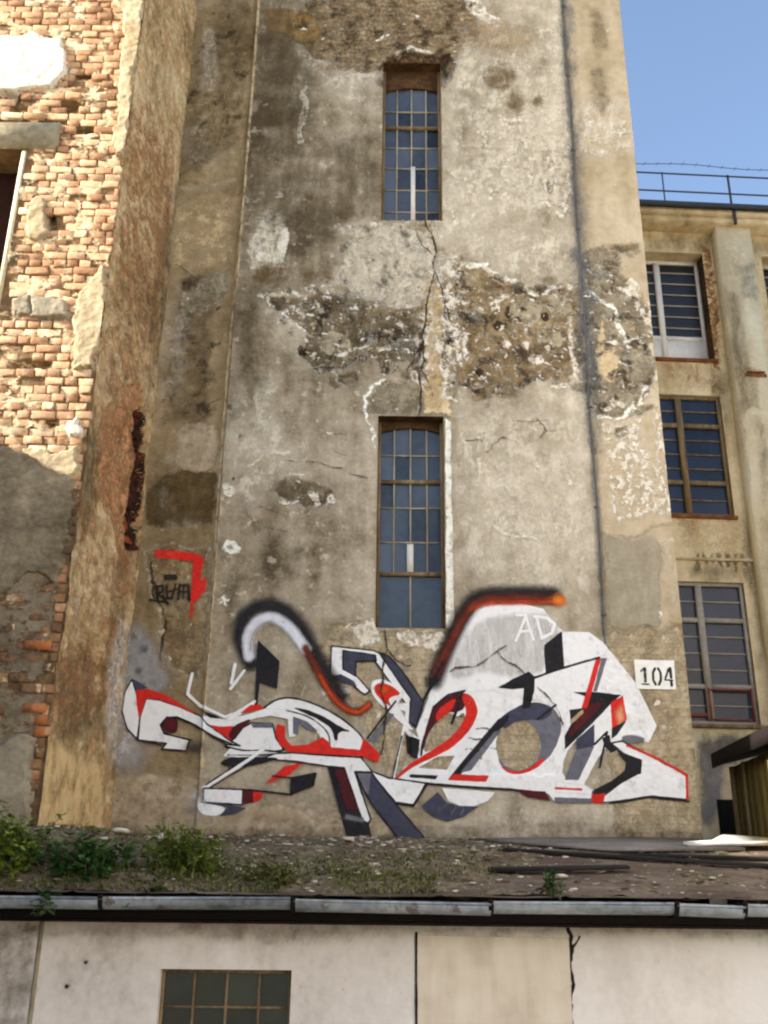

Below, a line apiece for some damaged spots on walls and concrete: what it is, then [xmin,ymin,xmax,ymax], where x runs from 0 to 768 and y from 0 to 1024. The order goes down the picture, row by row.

damp [252,0,309,208]
damp [309,56,382,109]
damp [304,137,442,300]
damp [228,388,288,506]
spalling [59,0,671,777]
crack [407,220,451,416]
crack [566,927,581,1024]